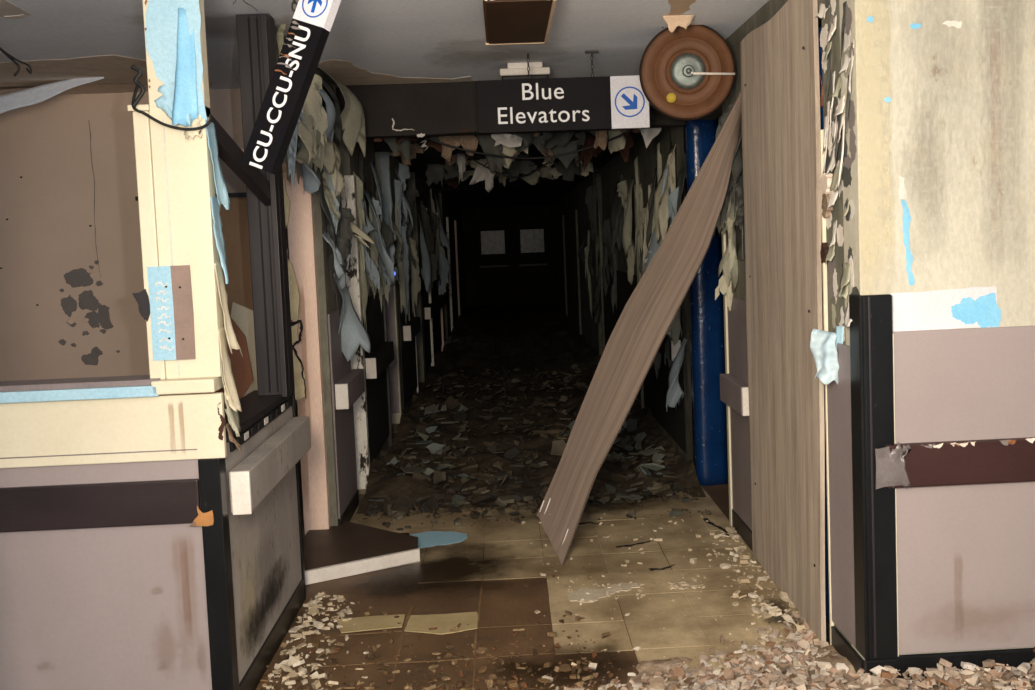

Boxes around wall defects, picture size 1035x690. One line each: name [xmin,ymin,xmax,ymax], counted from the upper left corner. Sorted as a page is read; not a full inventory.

peeling [663,0,696,32]
peeling [318,60,475,85]
peeling [0,0,243,437]
flaking render [283,137,303,227]
peeling [319,199,341,310]
flaking render [287,250,306,400]
damp [247,572,284,641]